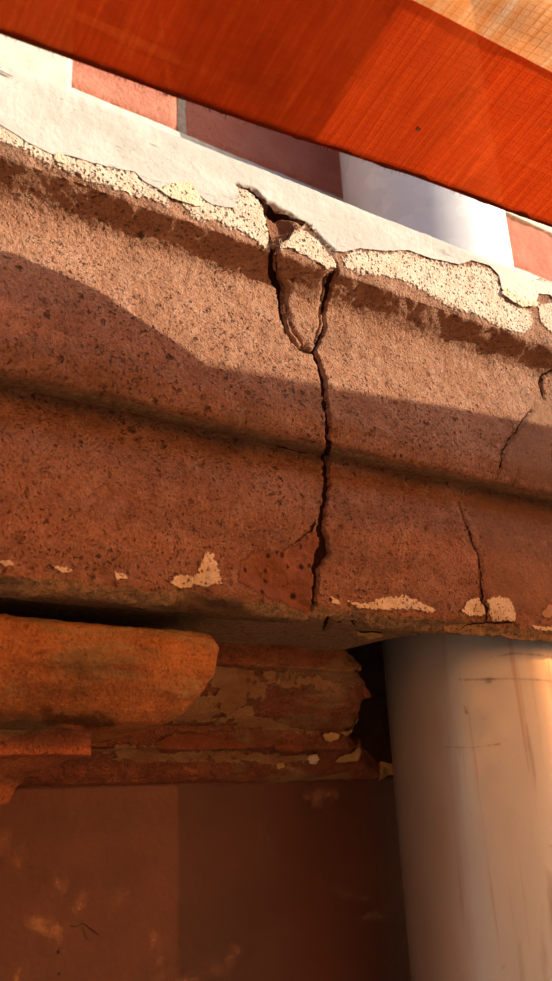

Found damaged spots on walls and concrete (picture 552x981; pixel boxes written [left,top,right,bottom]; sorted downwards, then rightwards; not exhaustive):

peeling [0,125,552,335]
crack [240,188,357,631]
crack [498,370,552,485]
peeling [171,552,221,588]
peeling [331,594,435,613]
crack [459,506,515,631]
peeling [462,596,516,622]
peeling [169,664,358,742]
peeling [91,741,319,769]
peeling [336,744,362,763]